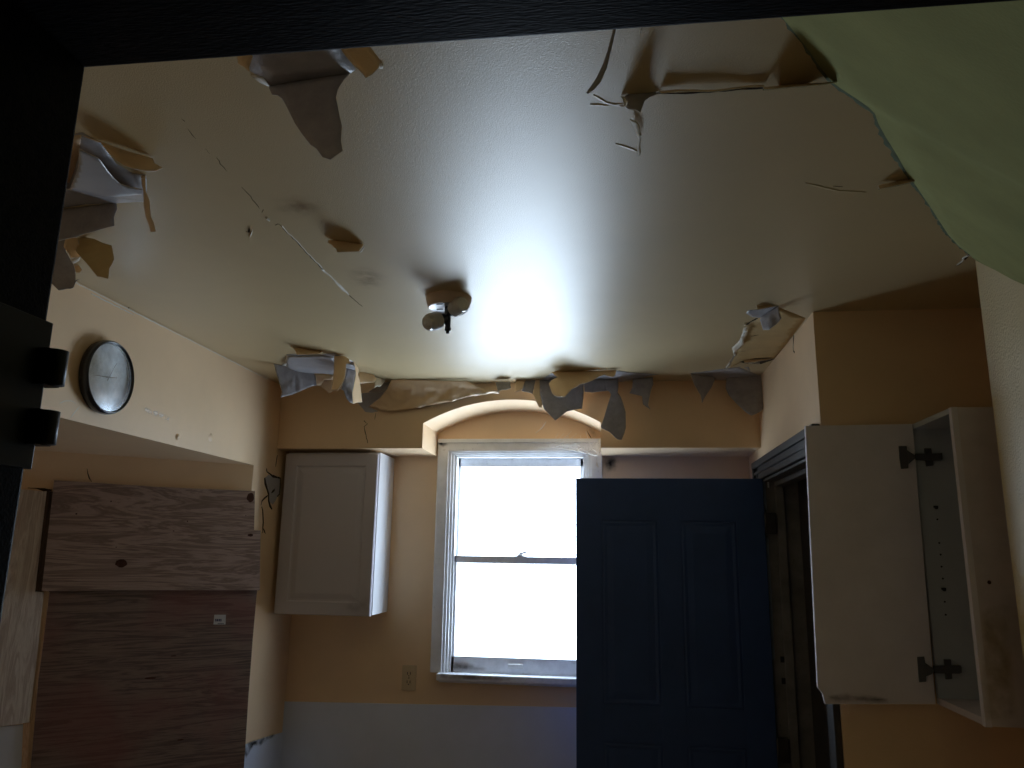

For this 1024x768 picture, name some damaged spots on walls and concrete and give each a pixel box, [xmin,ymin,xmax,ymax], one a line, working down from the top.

peeling [237,47,384,160]
peeling [586,29,660,156]
peeling [52,132,163,290]
crack [245,191,362,306]
peeling [327,240,364,253]
peeling [273,347,659,440]
peeling [690,305,805,416]